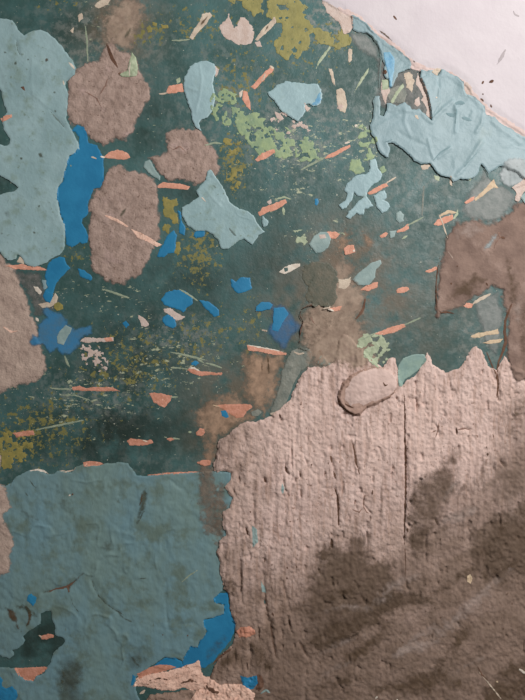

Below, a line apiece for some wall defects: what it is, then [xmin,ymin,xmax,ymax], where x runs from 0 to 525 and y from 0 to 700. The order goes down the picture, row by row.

peeling [172,12,212,41]
peeling [0,18,290,394]
spalling [207,1,525,700]
peeling [51,386,119,400]
peeling [149,392,177,407]
peeling [13,420,83,440]
peeling [127,438,153,446]
crack [401,396,409,578]
damp [416,469,452,519]
peeling [0,461,255,700]
damp [311,539,421,649]
damp [485,664,525,700]